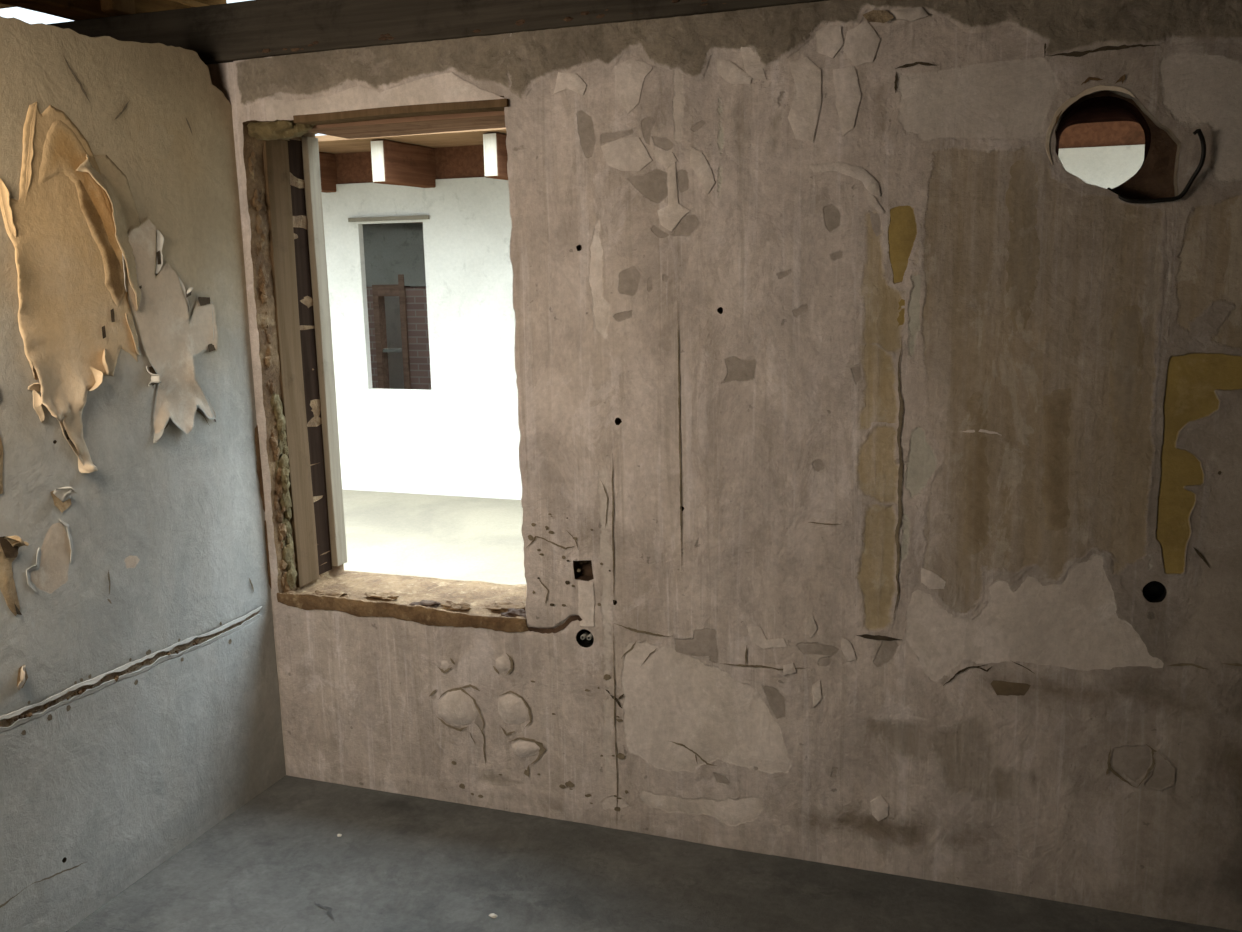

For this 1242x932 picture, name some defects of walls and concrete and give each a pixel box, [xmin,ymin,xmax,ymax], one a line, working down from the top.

peeling [0,102,218,473]
peeling [233,0,1242,682]
peeling [0,486,77,616]
peeling [17,664,28,690]
crack [470,724,486,765]
flaking render [559,615,857,827]
peeling [862,714,930,765]
peeling [870,795,889,821]
crack [0,863,83,908]